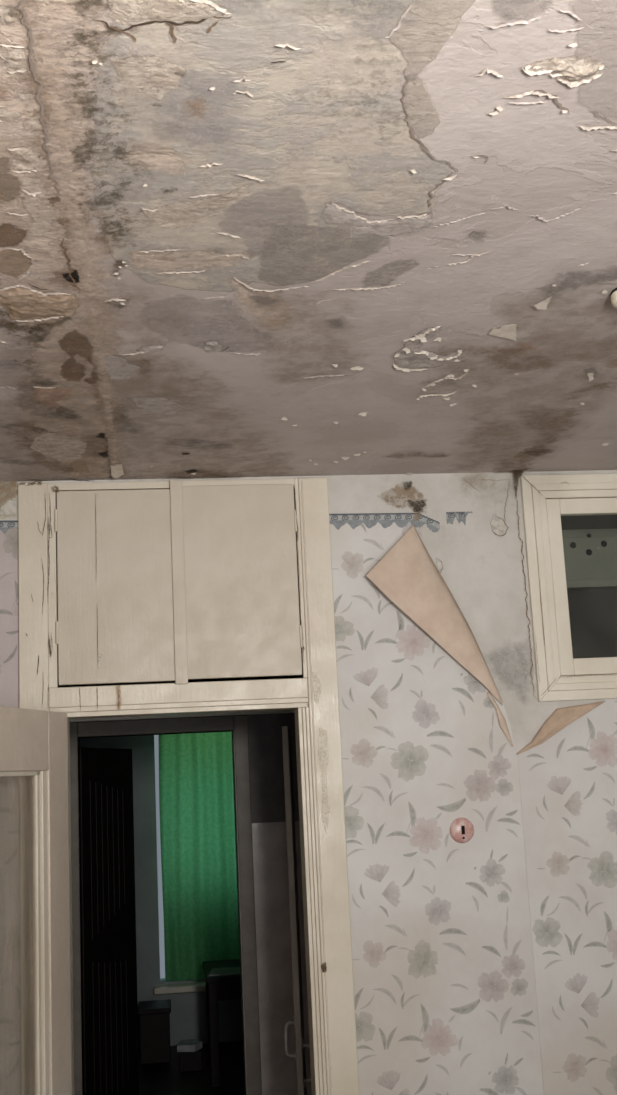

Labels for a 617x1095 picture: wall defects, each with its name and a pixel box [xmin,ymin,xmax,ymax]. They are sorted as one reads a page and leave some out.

crack [93,16,232,43]
peeling [522,9,604,88]
peeling [91,0,586,330]
peeling [22,177,68,240]
water stain [0,0,147,477]
peeling [393,326,477,406]
peeling [489,324,517,341]
peeling [30,433,86,461]
water stain [463,413,571,496]